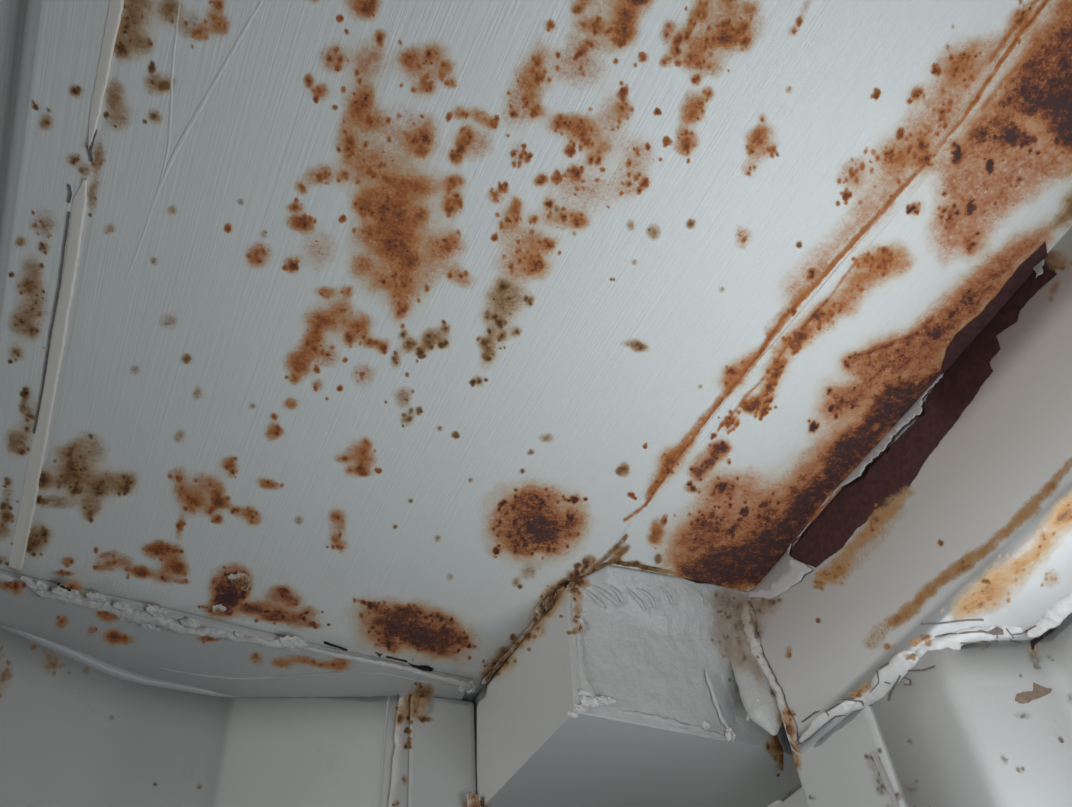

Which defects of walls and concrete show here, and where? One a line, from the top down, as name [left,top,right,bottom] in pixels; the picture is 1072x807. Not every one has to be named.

crack [33,184,72,434]
crack [87,129,97,162]
rust [246,232,270,267]
rust [285,0,653,400]
rust [353,0,1072,682]
rust [26,526,51,557]
rust [36,434,136,523]
rust [93,457,260,584]
rust [198,565,330,629]
peeling [749,242,1057,599]
rust [396,683,433,749]
crack [796,619,1056,746]